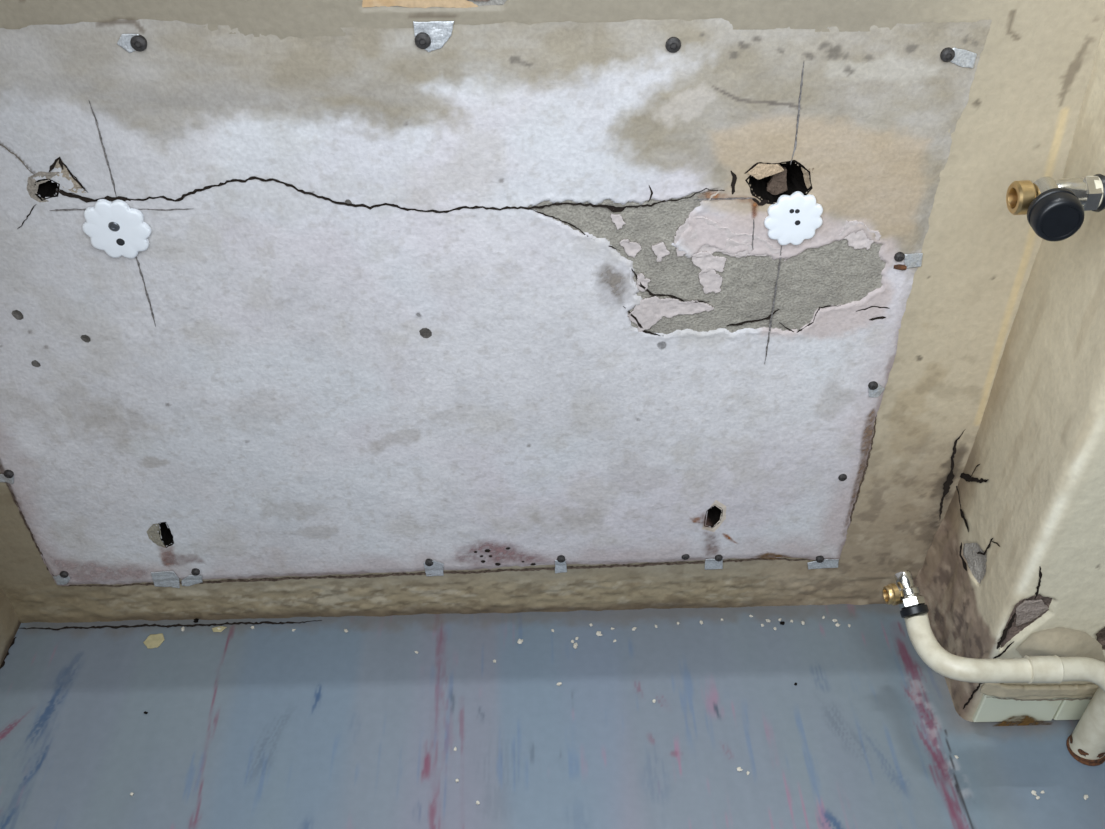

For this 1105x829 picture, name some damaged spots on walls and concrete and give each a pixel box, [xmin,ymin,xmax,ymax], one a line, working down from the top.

spalling [362,0,507,8]
crack [55,171,725,213]
flaking render [0,18,992,587]
crack [939,429,988,532]
leakage [470,543,536,566]
spalling [959,538,1000,584]
spalling [993,567,1053,659]
spalling [1096,627,1105,650]